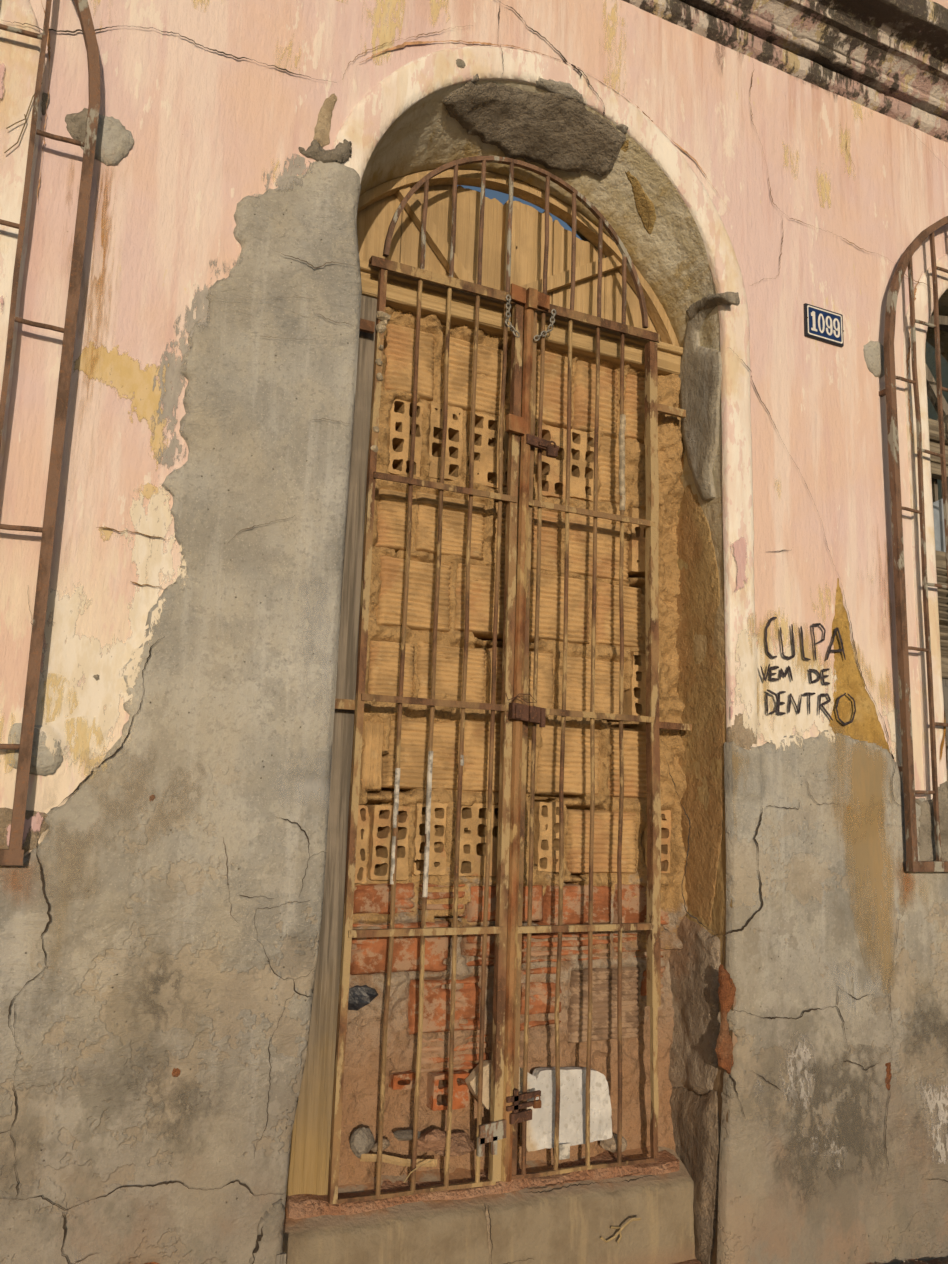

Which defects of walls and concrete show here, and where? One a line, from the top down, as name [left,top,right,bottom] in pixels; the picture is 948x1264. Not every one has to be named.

crack [3,1,605,114]
crack [750,63,925,284]
peeling [74,341,169,470]
peeling [34,483,188,776]
spalling [0,808,49,854]
crack [0,818,328,1264]
crack [730,886,905,1185]
leakage [781,1036,880,1183]
leakage [921,1084,948,1164]
spalling [249,1199,285,1264]